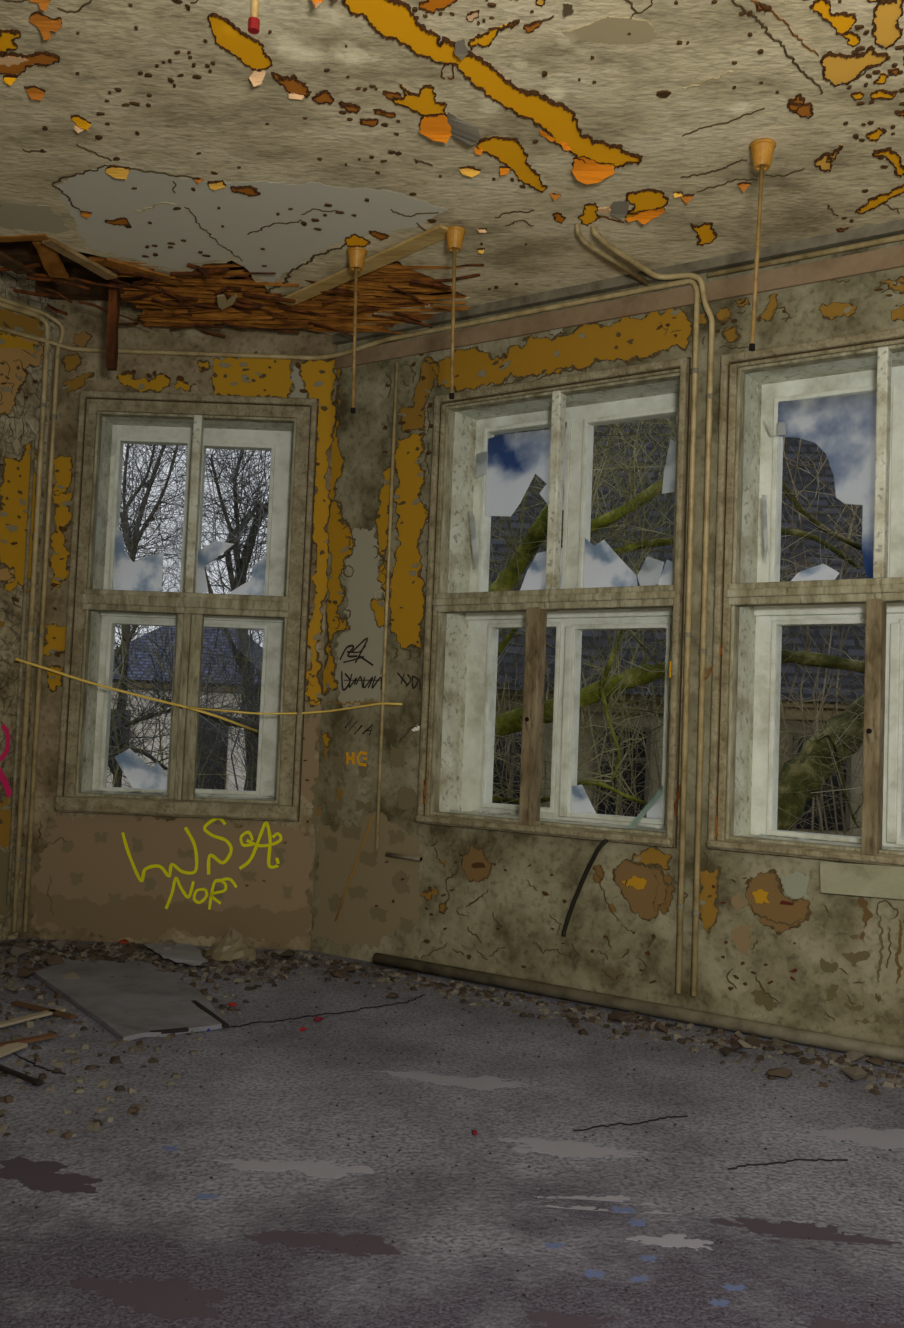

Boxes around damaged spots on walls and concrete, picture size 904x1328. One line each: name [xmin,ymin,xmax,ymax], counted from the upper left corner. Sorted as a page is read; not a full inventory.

peeling [0,0,62,101]
crack [732,0,883,95]
peeling [809,0,904,117]
crack [23,143,346,294]
peeling [207,0,695,226]
crack [682,108,765,137]
crack [681,159,805,192]
peeling [836,127,904,233]
peeling [0,442,74,592]
peeling [116,293,791,708]
leakage [0,1156,103,1194]
crack [727,1158,848,1170]